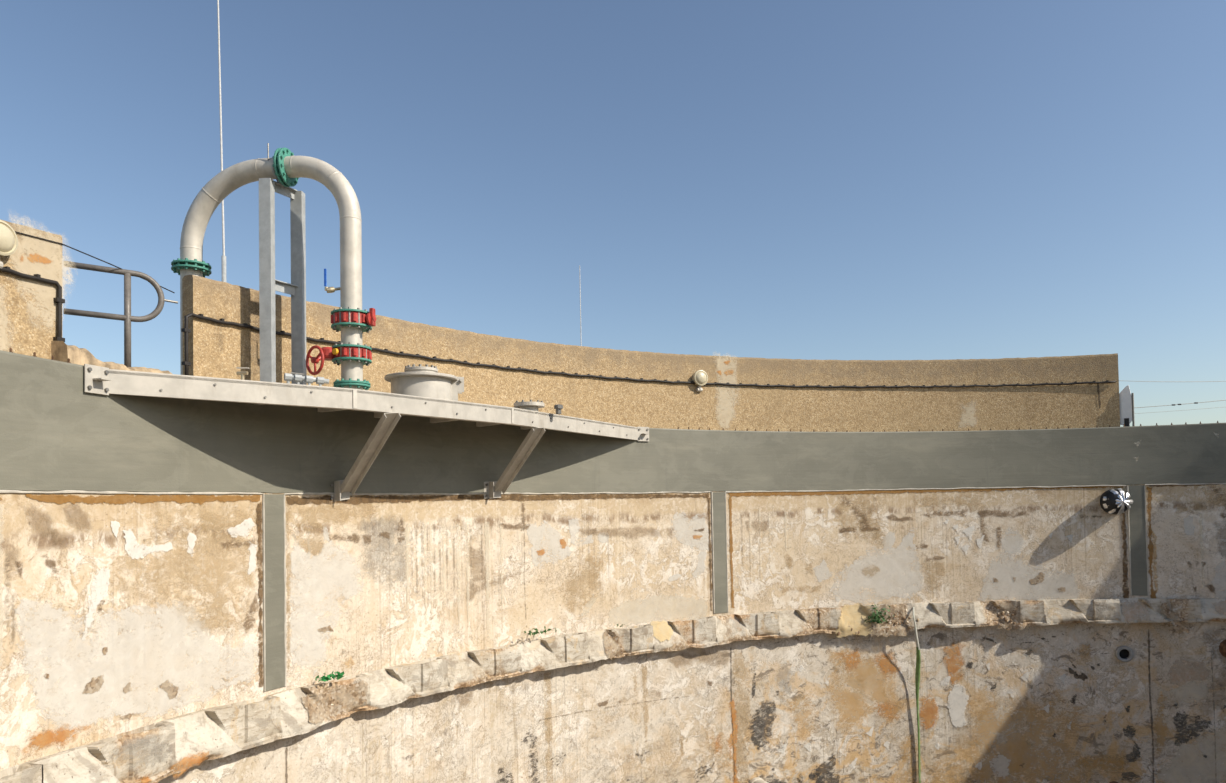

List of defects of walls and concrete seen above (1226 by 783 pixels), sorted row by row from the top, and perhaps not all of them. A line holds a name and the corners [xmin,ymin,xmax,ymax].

peeling [111,521,197,559]
peeling [228,518,257,575]
peeling [82,568,110,640]
spalling [83,675,104,694]
spalling [159,680,179,699]
damp [521,714,566,783]
mould [747,673,779,750]
peeling [941,672,1029,779]
damp [1121,706,1141,780]
damp [1172,704,1212,746]